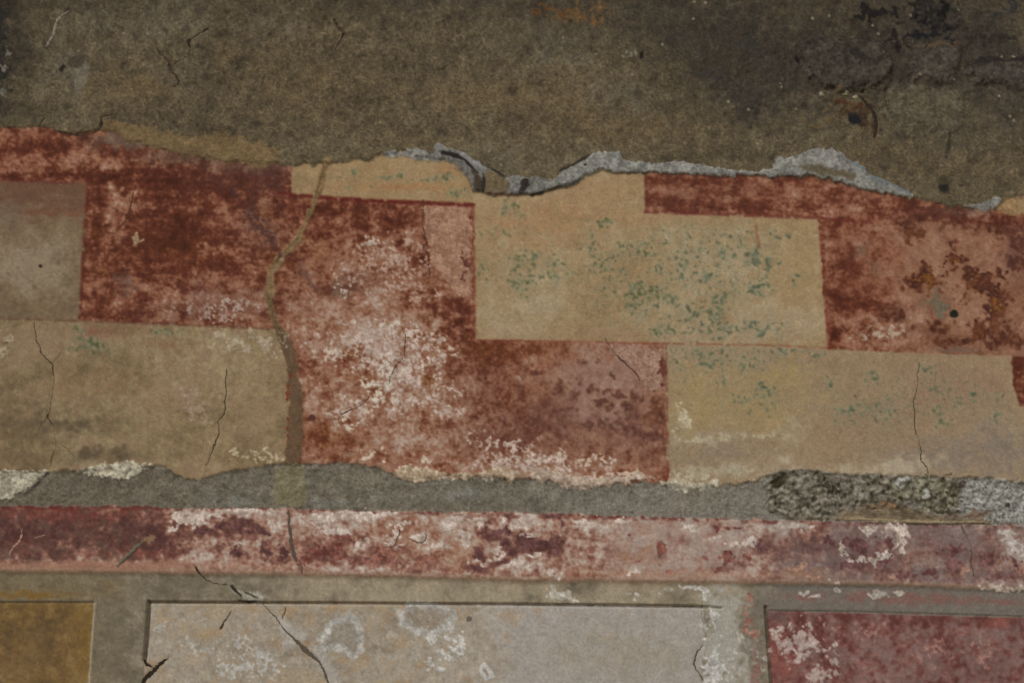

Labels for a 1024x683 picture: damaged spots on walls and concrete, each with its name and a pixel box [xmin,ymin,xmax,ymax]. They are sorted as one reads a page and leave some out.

flaking render [381,139,915,200]
damp [163,179,471,438]
crack [263,155,332,574]
crack [206,370,227,465]
crack [901,363,936,477]
flaking render [0,468,50,501]
flaking render [76,459,164,481]
damp [355,446,387,464]
flaking render [392,463,721,495]
damp [193,515,445,573]
damp [462,512,570,573]
crack [263,604,329,683]